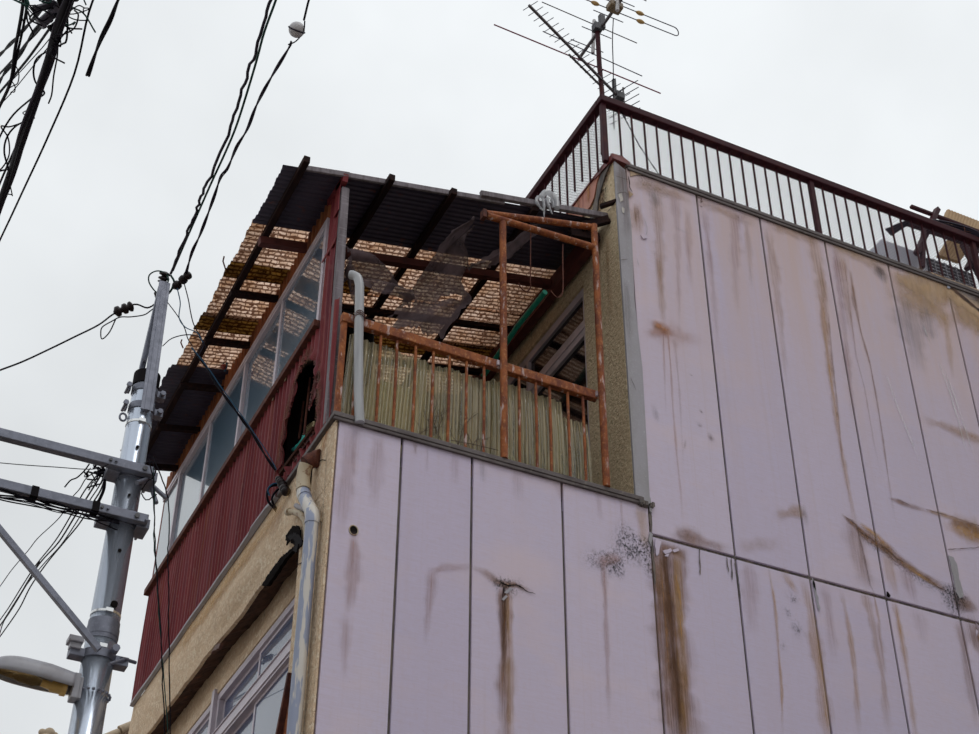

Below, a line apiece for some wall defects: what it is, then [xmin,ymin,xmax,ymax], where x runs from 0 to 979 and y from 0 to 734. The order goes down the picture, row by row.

water stain [898,275,979,329]
spalling [261,525,303,586]
water stain [602,532,653,582]
corrosion [848,519,930,582]
corrosion [956,522,979,540]
corrosion [495,579,518,708]
corrosion [655,547,691,728]